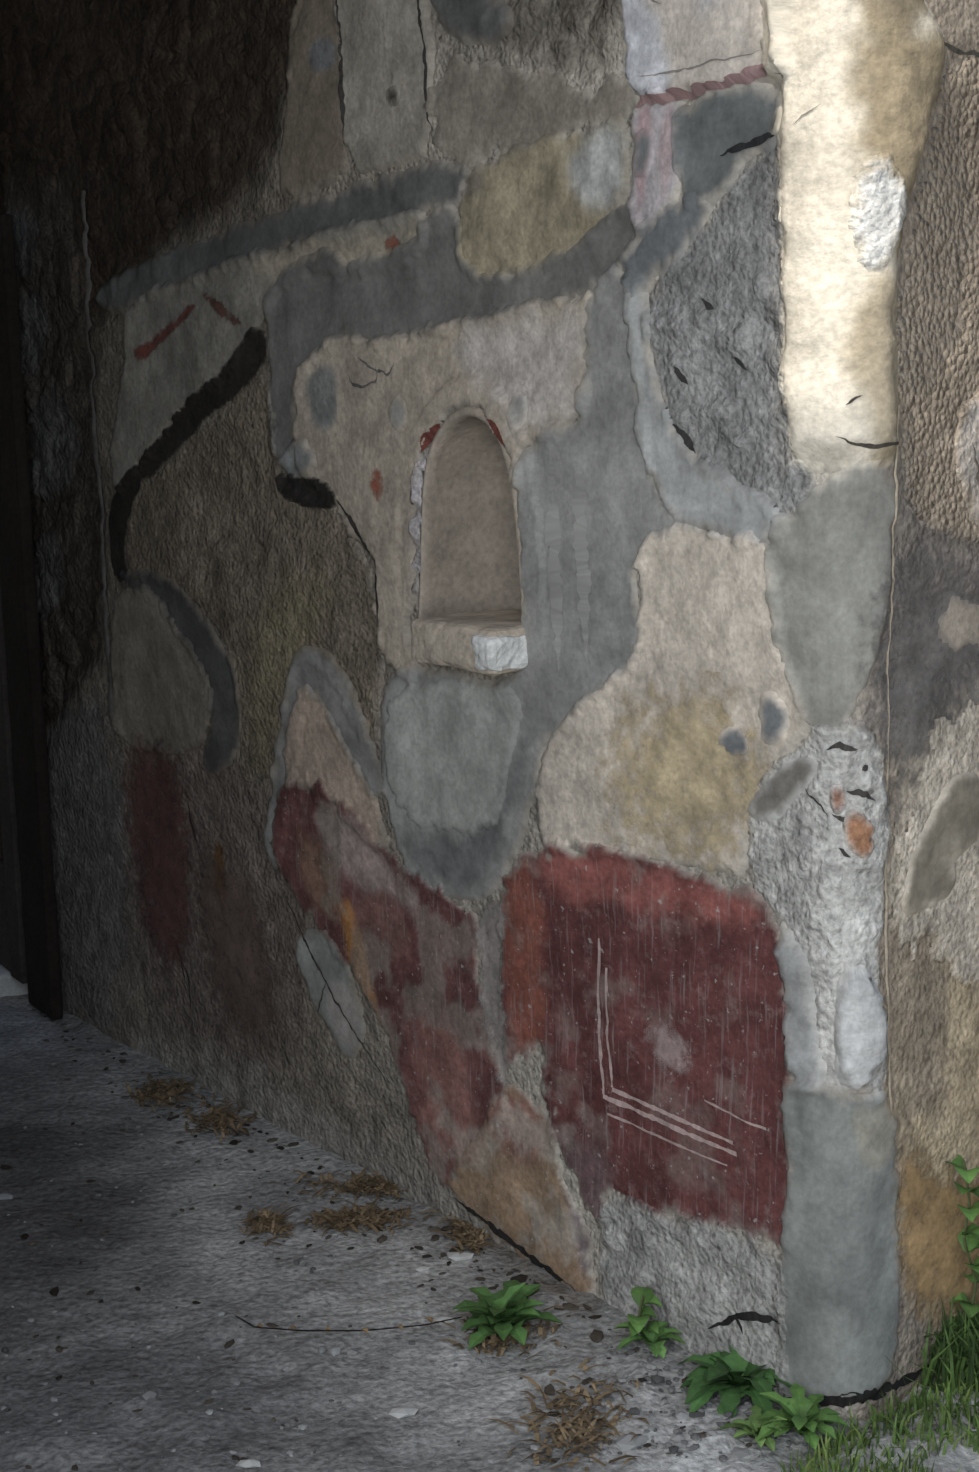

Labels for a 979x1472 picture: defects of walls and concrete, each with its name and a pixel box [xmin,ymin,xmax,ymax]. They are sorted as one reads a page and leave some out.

spalling [649,131,816,515]
spalling [718,691,979,1095]
crack [707,1311,780,1334]
crack [787,1364,929,1408]